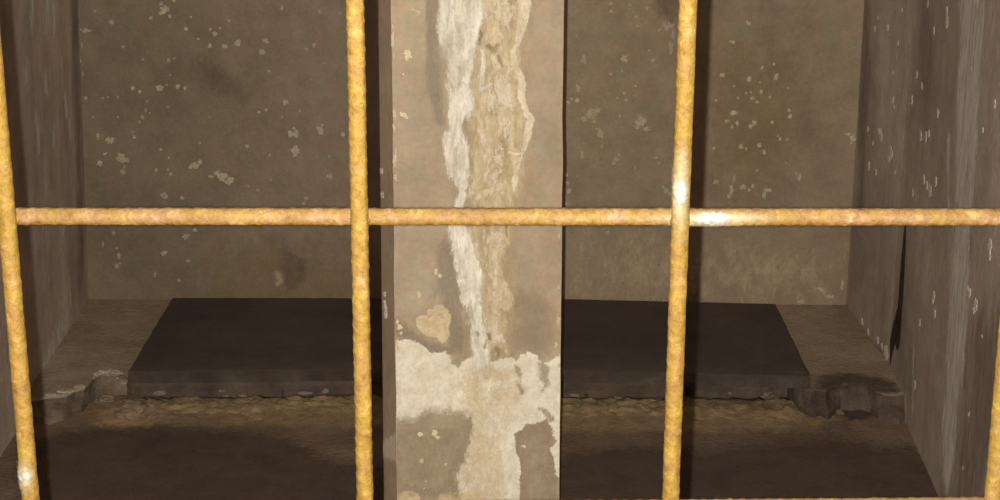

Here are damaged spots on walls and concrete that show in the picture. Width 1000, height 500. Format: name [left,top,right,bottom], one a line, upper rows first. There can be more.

water stain [427,0,535,208]
flaking render [45,384,85,397]
flaking render [383,291,579,500]
crack [890,225,906,364]